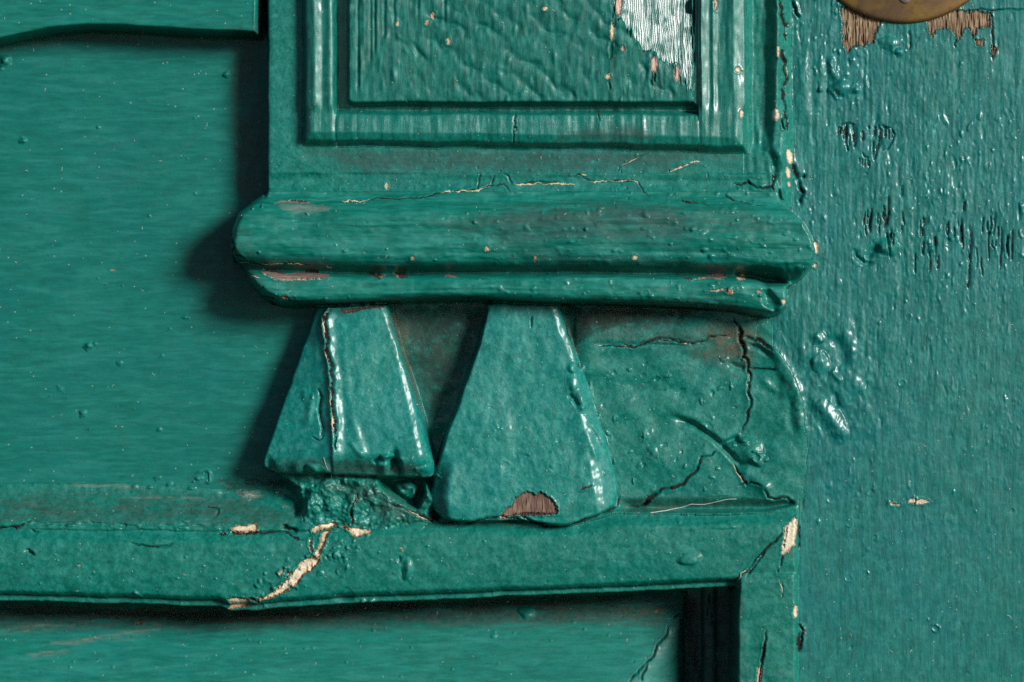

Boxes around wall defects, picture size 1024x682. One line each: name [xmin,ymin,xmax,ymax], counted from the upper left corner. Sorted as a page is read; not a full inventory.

peeling [610,0,625,52]
peeling [840,6,881,54]
peeling [927,9,997,56]
peeling [650,56,659,74]
crack [838,123,895,166]
crack [339,153,647,203]
crack [863,187,1013,289]
crack [313,312,337,451]
crack [599,319,773,433]
peeling [499,491,558,519]
peeling [781,518,798,555]
peeling [227,522,371,609]